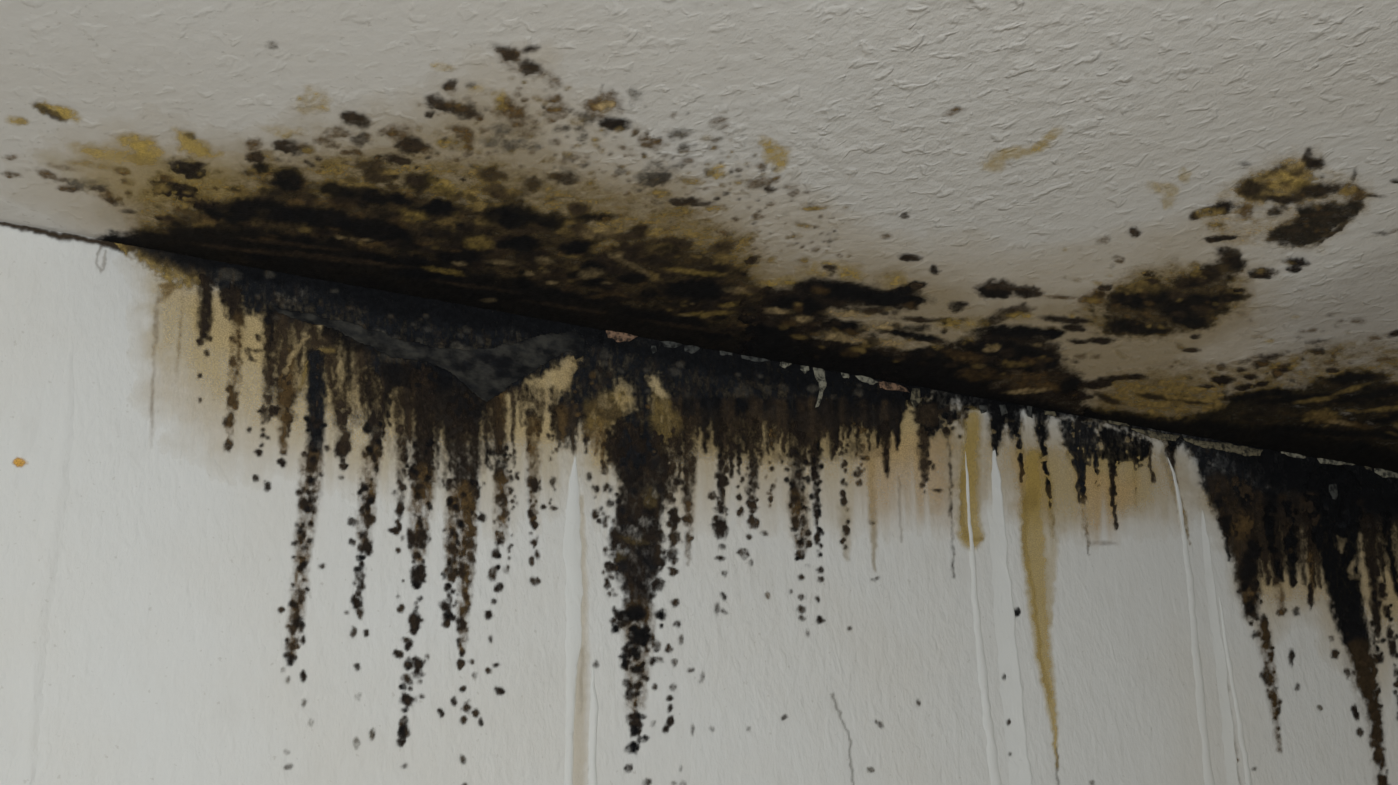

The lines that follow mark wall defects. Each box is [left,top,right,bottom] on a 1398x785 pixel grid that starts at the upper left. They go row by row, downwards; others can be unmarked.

damp [496,47,558,84]
damp [10,103,78,124]
damp [341,112,370,127]
damp [425,95,483,155]
damp [482,96,539,152]
damp [538,92,662,158]
damp [66,135,163,184]
damp [39,171,138,205]
damp [99,127,1398,785]